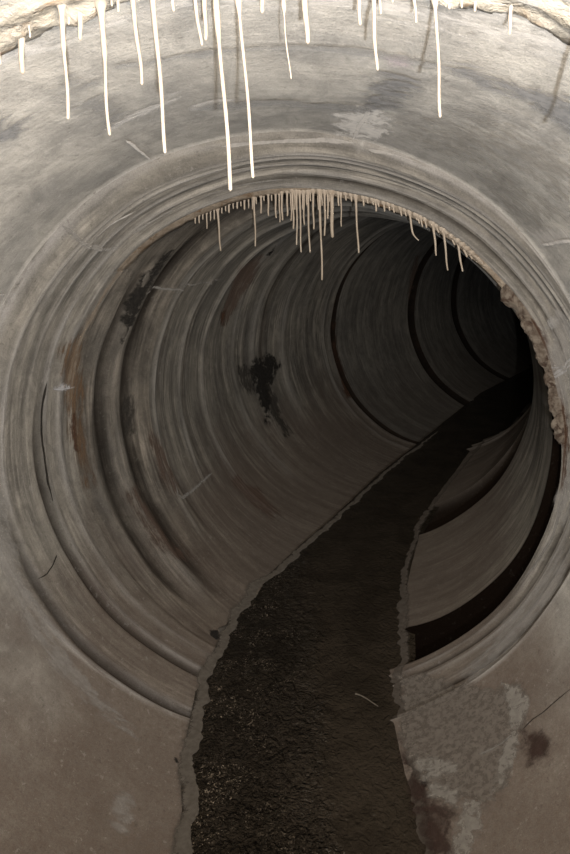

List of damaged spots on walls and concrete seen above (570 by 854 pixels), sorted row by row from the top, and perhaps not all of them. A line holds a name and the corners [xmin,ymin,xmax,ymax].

water stain [0,0,130,56]
water stain [438,0,570,46]
water stain [0,116,23,142]
water stain [272,45,570,132]
water stain [54,179,505,402]
crack [40,384,53,501]
rust [58,337,94,487]
water stain [236,354,291,438]
water stain [524,731,549,766]
water stain [409,776,455,854]